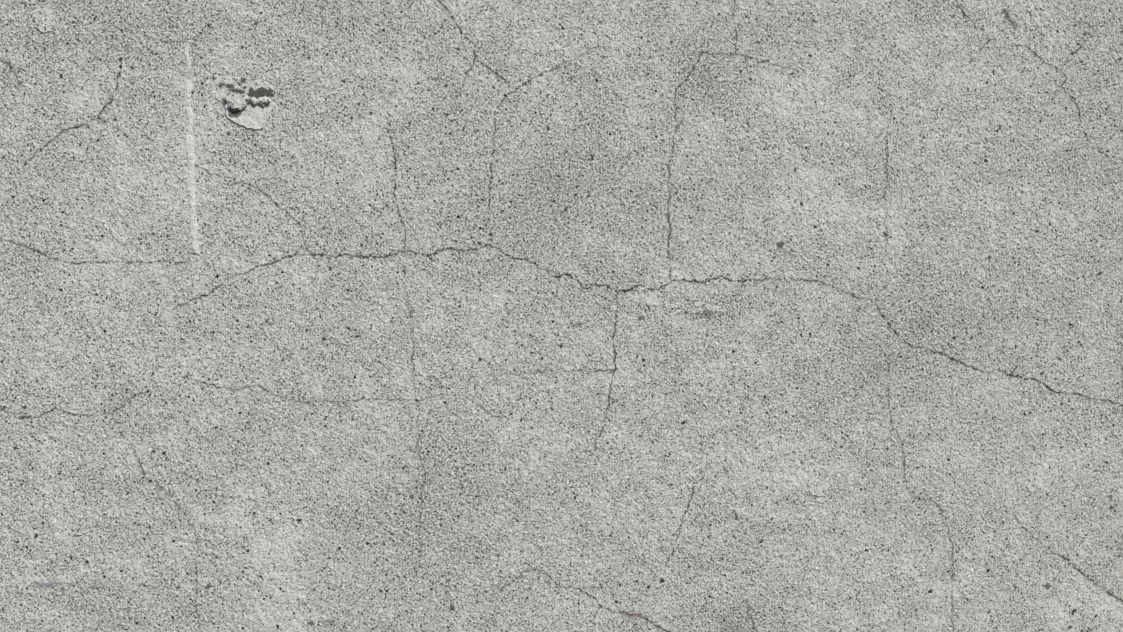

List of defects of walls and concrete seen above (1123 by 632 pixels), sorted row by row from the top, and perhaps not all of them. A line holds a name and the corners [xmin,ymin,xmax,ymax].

peeling [215,86,274,136]
crack [1018,40,1116,164]
crack [178,0,789,449]
crack [800,278,1123,406]
crack [1017,519,1123,602]